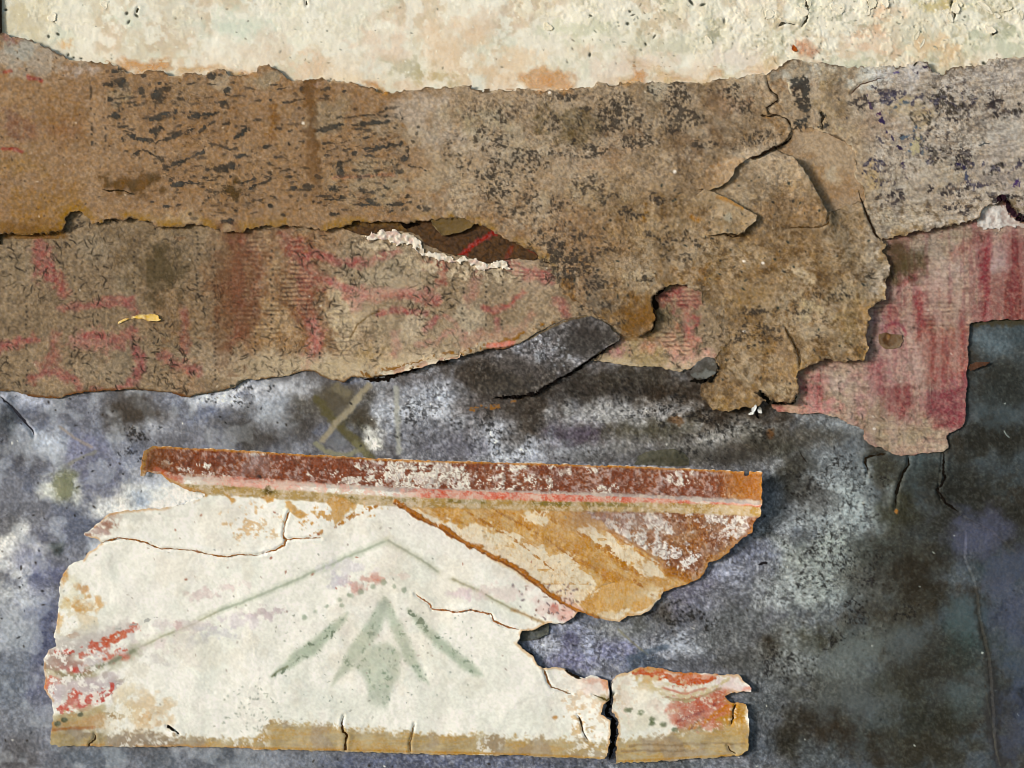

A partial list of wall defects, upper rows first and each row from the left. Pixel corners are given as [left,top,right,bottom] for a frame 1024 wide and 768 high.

crack [747,76,793,160]
crack [858,191,880,239]
flaking render [976,204,1024,234]
flaking render [365,229,511,271]
leakage [729,306,809,349]
peeling [473,315,621,398]
leakage [450,411,539,459]
leakage [595,378,770,461]
crack [102,512,320,557]
leakage [783,503,882,650]
peeling [520,623,549,641]
crack [417,596,617,760]